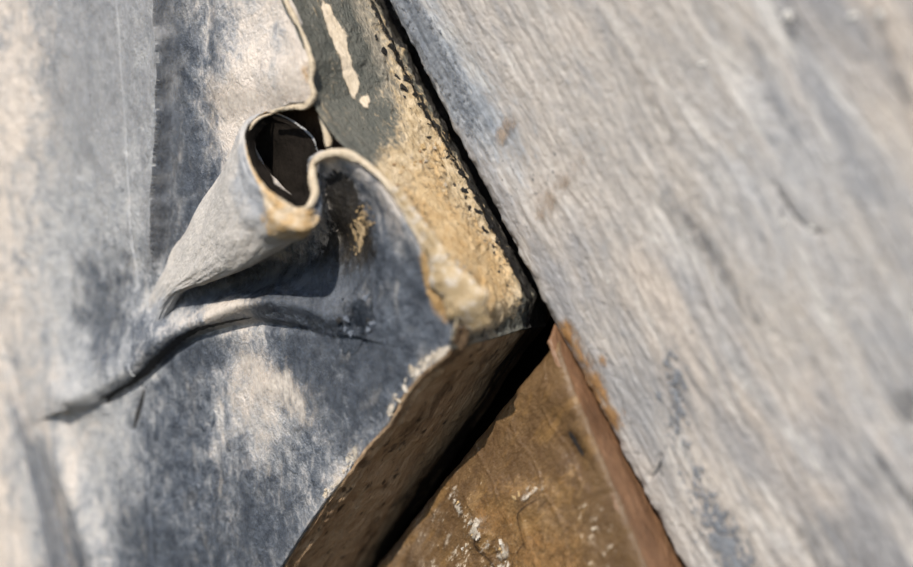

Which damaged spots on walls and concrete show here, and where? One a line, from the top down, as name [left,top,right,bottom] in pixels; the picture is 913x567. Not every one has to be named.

peeling [321,1,370,108]
peeling [375,34,400,63]
peeling [347,202,375,255]
peeling [390,74,523,318]
peeling [204,299,248,321]
spalling [335,287,377,356]
peeling [242,355,304,421]
peeling [387,345,450,416]
corrosion [559,319,623,431]
peeling [323,446,357,501]
crack [469,498,539,567]